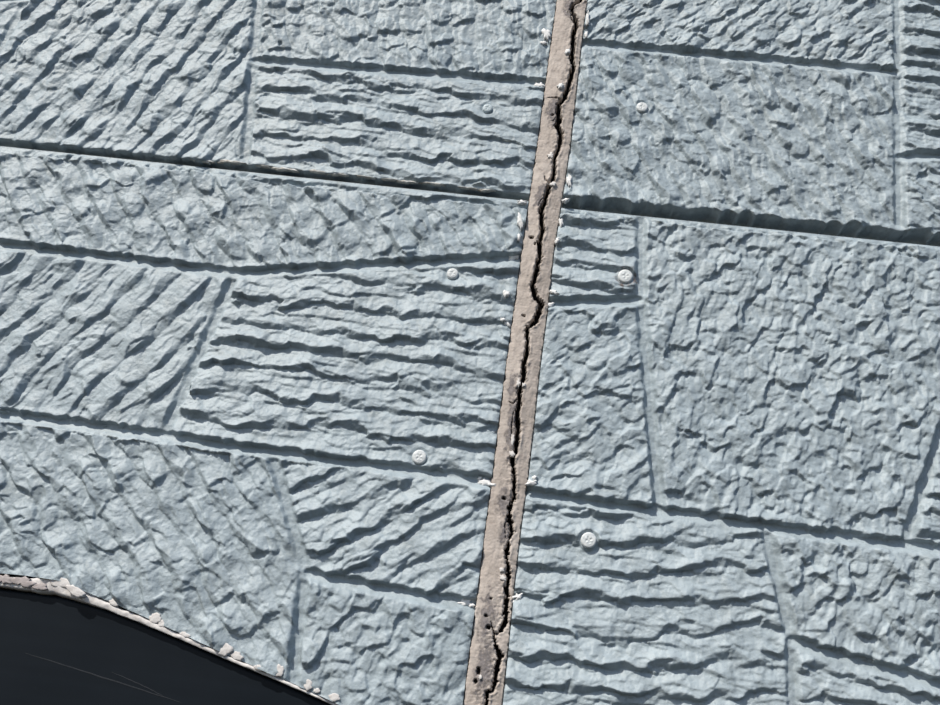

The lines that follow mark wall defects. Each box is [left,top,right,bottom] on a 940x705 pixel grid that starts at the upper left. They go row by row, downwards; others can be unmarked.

crack [474,0,582,705]